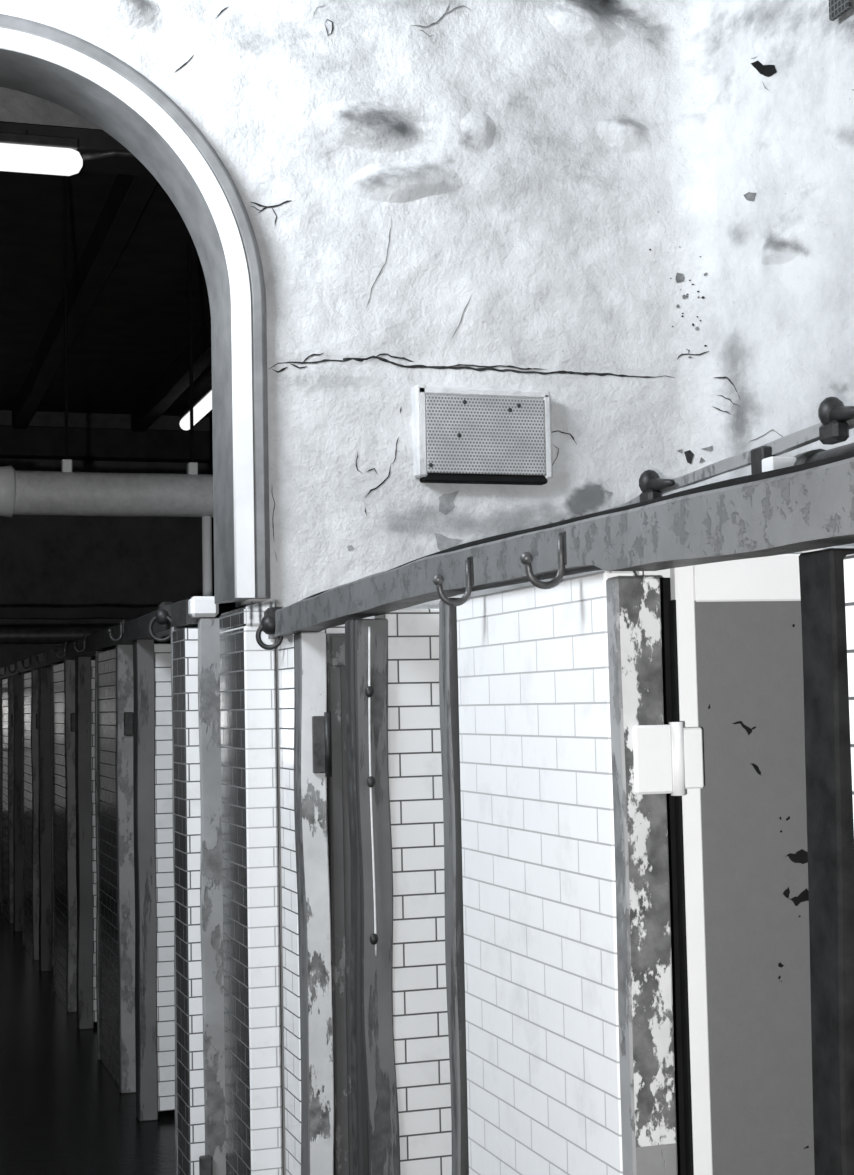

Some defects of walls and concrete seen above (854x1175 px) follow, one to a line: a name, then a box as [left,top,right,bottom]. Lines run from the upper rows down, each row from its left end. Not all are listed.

crack [269,295,740,415]
peeling [785,849,808,864]
peeling [783,887,809,917]